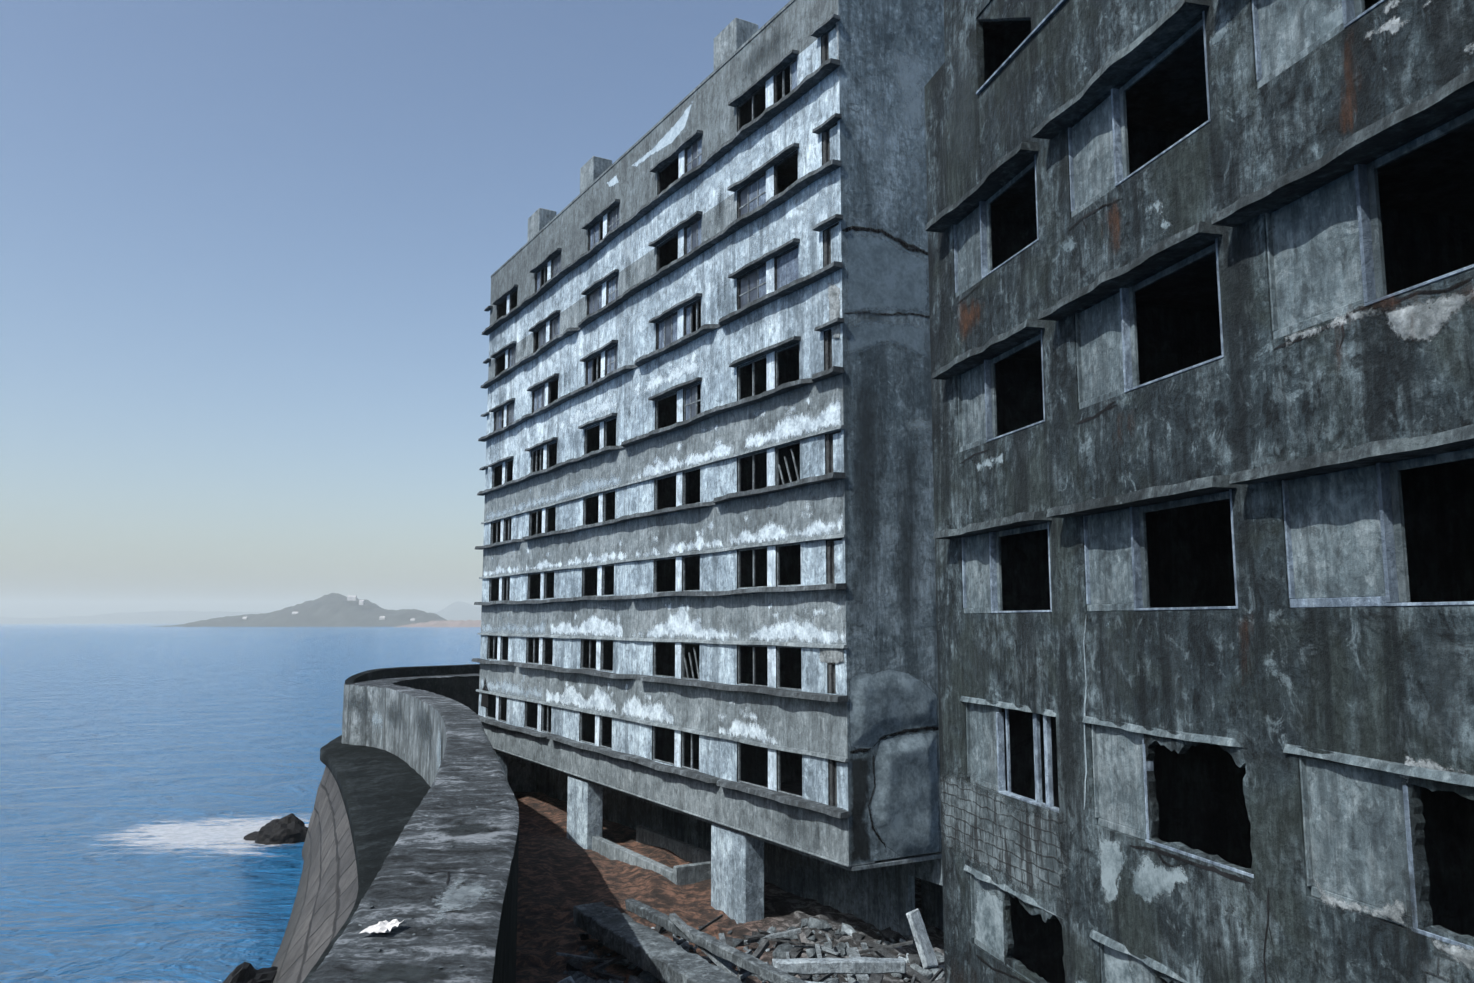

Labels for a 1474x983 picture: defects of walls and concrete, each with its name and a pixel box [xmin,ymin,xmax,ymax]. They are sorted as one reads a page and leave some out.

crack [842,226,928,255]
crack [844,285,984,318]
spalling [1285,291,1474,342]
crack [849,726,939,848]
peeling [1096,734,1253,903]